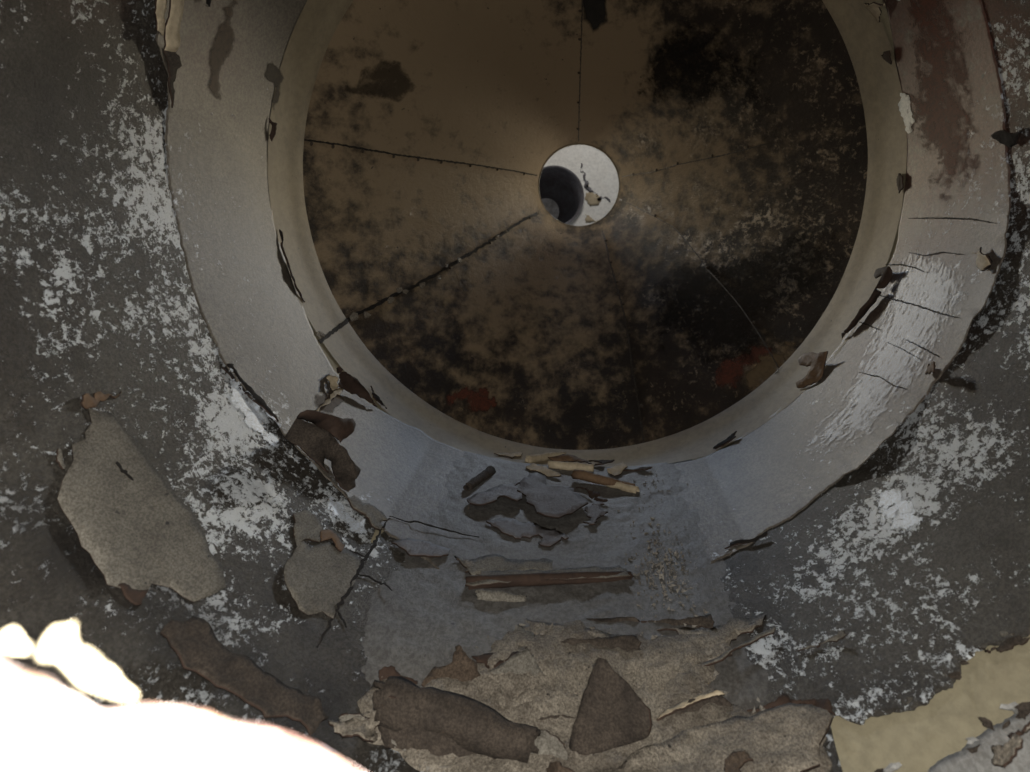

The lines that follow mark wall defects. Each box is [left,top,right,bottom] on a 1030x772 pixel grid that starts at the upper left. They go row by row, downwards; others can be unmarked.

peeling [154,0,184,108]
crack [909,216,991,224]
crack [885,252,965,273]
crack [859,322,940,360]
crack [880,295,959,318]
crack [859,372,905,389]
peeling [284,367,387,531]
peeling [56,391,226,606]
peeling [463,466,522,506]
peeling [283,510,361,618]
crack [317,516,478,648]
peeling [928,702,1030,772]